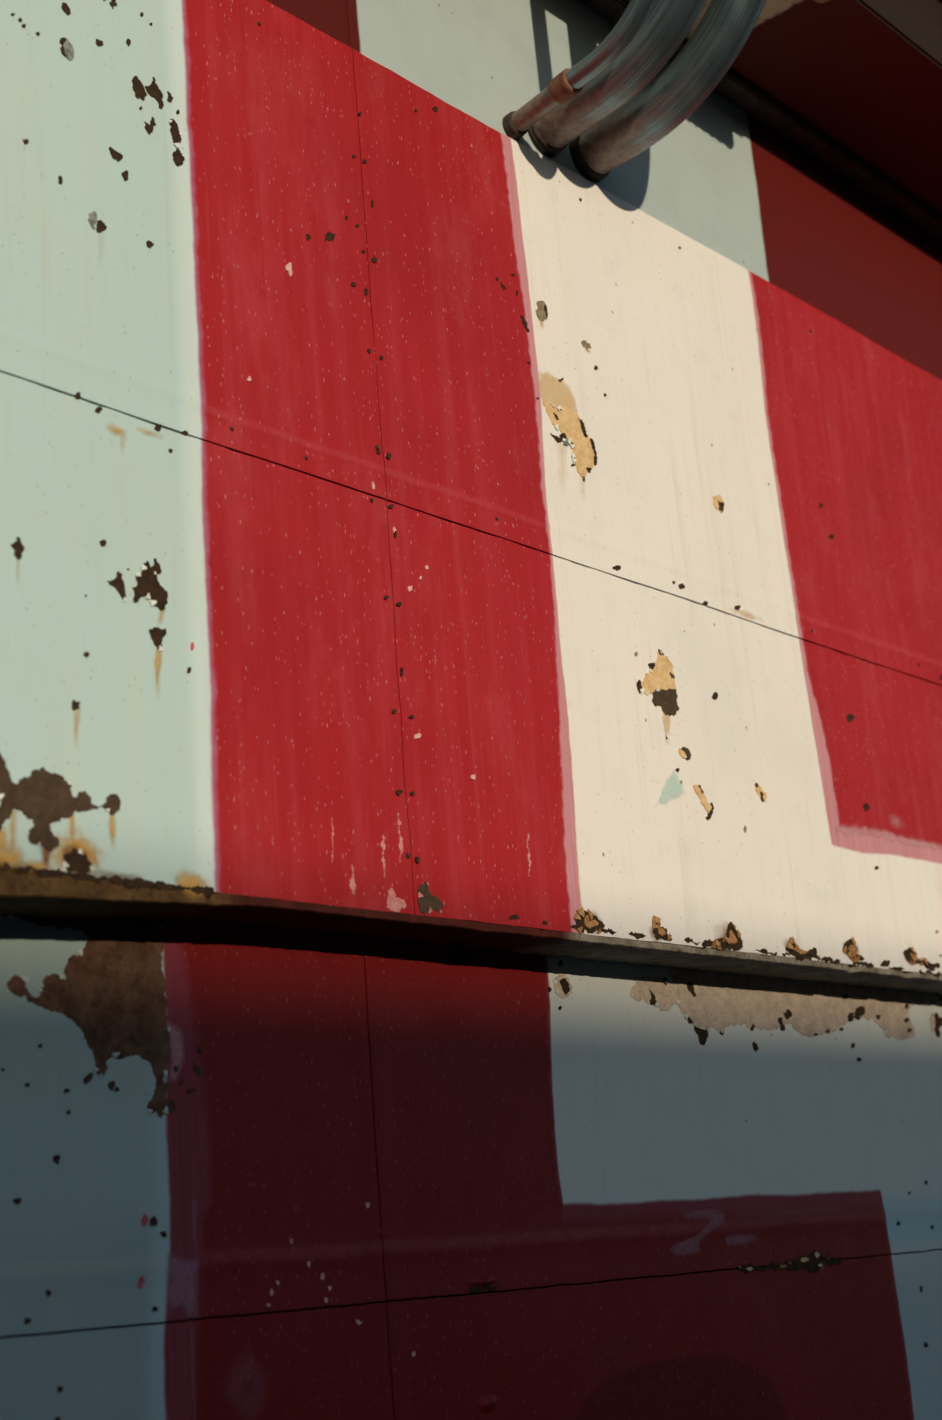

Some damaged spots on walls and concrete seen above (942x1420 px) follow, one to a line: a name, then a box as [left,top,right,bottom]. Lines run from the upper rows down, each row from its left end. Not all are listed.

peeling [109,147,129,181]
peeling [132,76,185,166]
peeling [527,361,597,482]
rust [107,558,168,679]
peeling [634,649,714,820]
rust [0,754,214,897]
peeling [386,881,444,915]
peeling [574,907,601,934]
peeling [652,915,672,941]
peeling [843,937,860,963]
rust [2,915,203,1118]
peeling [630,967,942,1061]